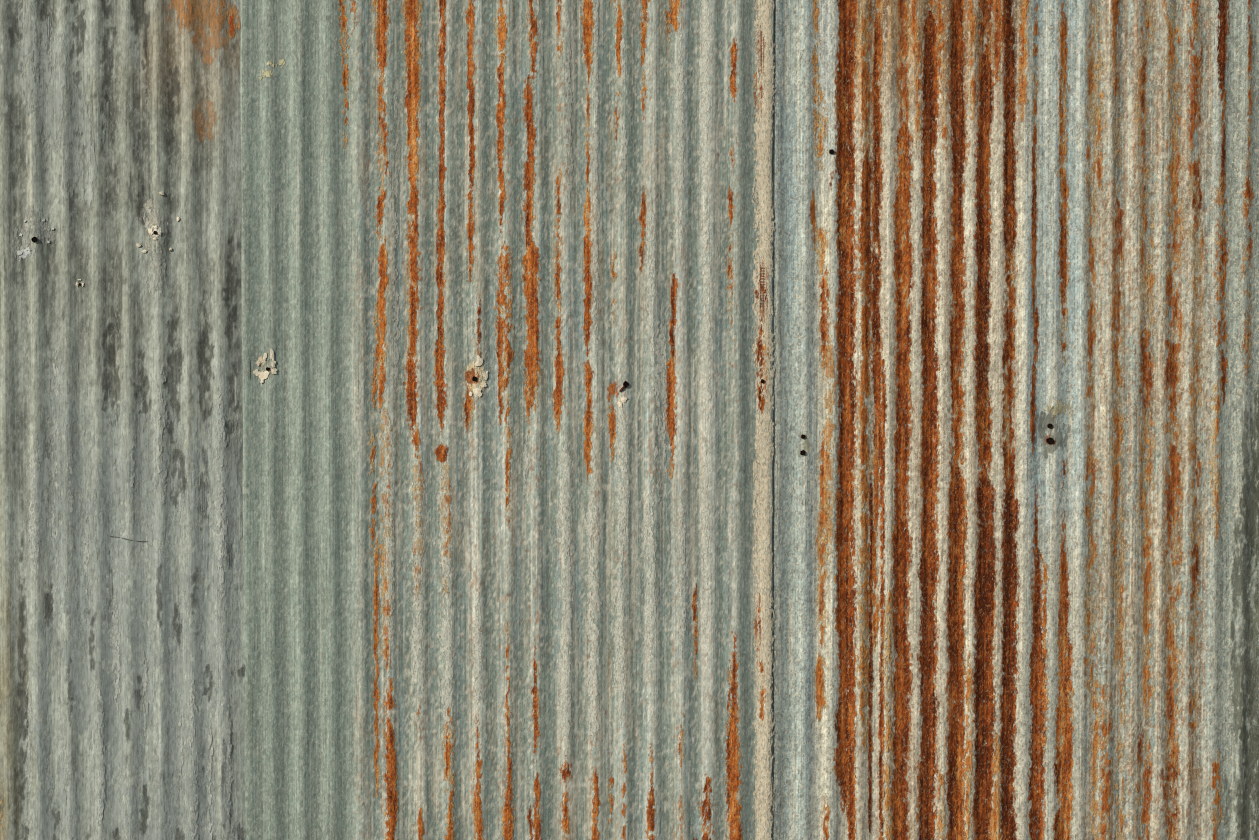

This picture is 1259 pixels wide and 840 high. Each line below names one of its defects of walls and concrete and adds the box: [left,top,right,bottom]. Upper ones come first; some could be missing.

corrosion [466,0,476,282]
corrosion [476,0,565,522]
corrosion [580,0,595,485]
corrosion [339,0,452,840]
corrosion [664,273,679,483]
corrosion [809,0,1253,840]
corrosion [442,707,456,840]
corrosion [472,718,484,840]
corrosion [502,623,542,840]
corrosion [591,744,628,840]
corrosion [645,747,655,840]
corrosion [678,633,742,840]